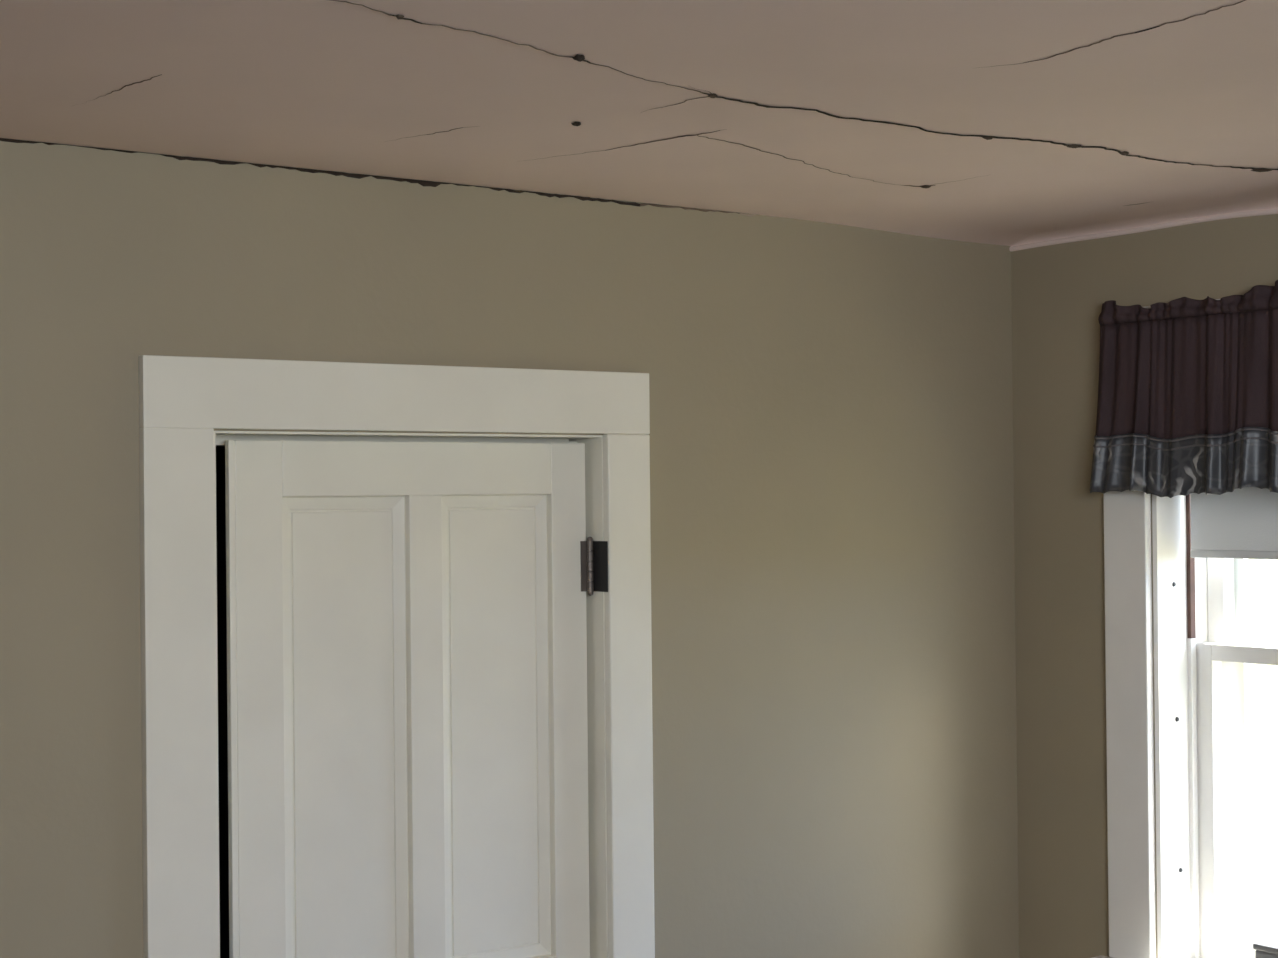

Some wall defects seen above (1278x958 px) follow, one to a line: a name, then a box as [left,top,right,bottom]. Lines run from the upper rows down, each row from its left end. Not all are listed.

crack [0,0,1278,217]